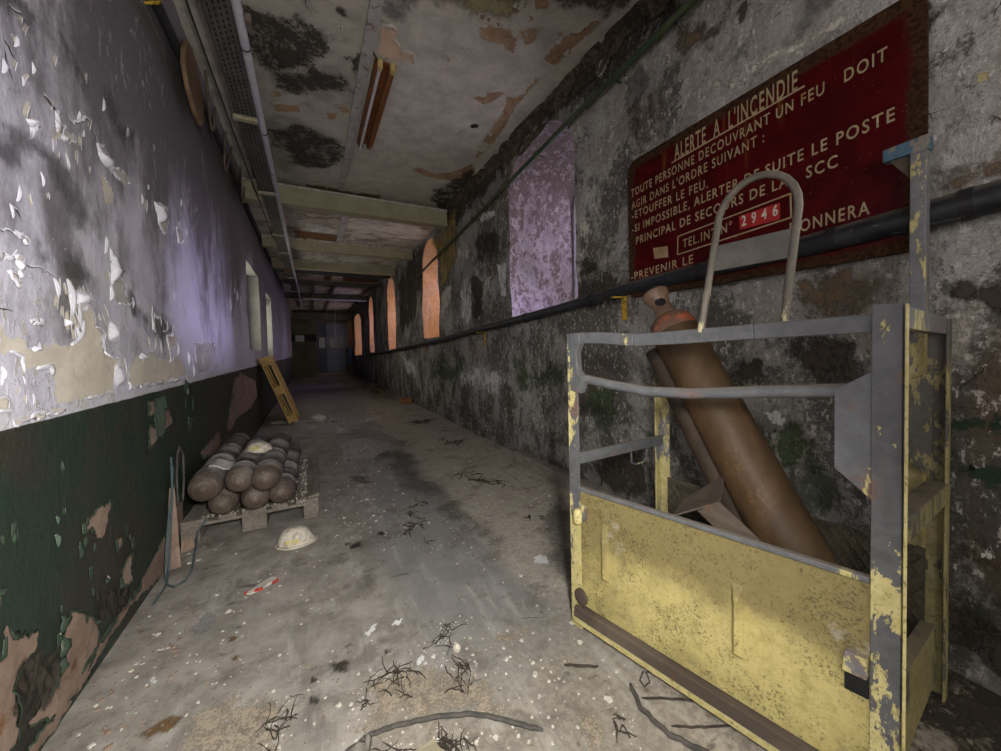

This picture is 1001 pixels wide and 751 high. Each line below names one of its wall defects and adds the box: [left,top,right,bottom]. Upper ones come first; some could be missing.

crack [4,37,18,81]
mould [242,4,361,95]
crack [44,93,98,142]
flaking render [410,0,670,221]
peeling [88,141,131,204]
peeling [0,185,34,288]
crack [0,206,56,277]
leakage [397,163,507,331]
peeling [0,236,218,450]
leakage [948,280,1001,330]
leakage [594,451,650,497]
peeling [0,475,184,751]